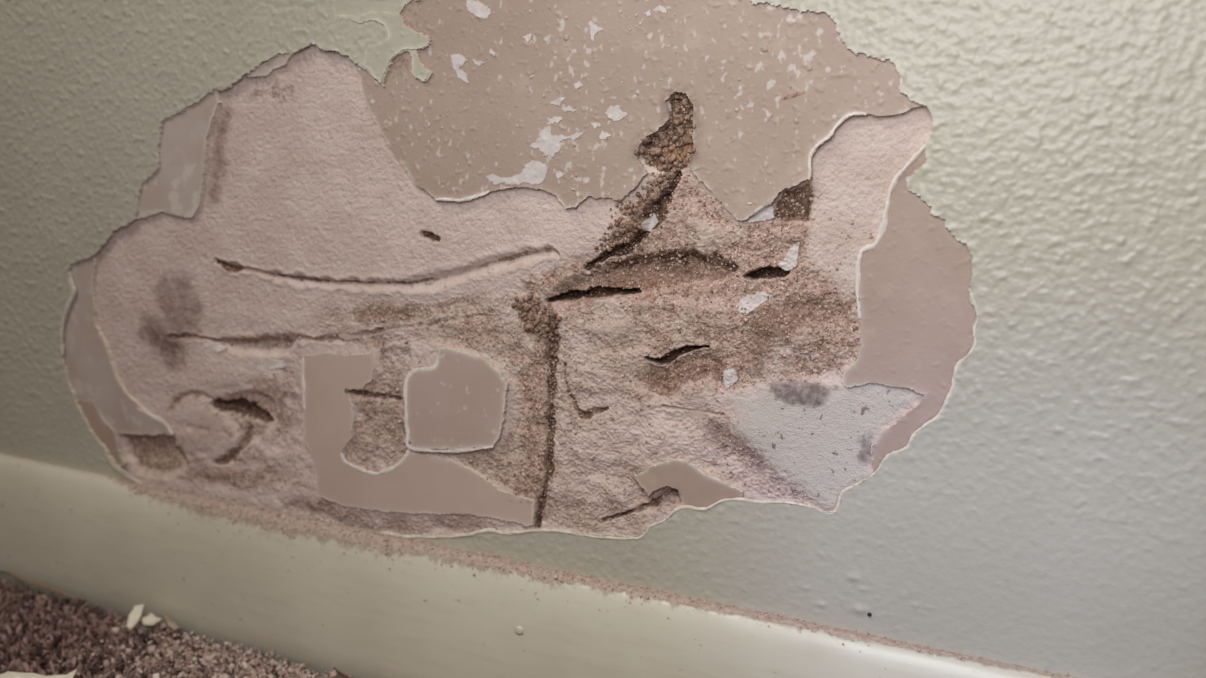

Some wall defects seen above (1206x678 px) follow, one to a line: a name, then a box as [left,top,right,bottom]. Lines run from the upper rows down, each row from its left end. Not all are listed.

peeling [467,0,532,42]
crack [585,172,682,270]
crack [217,259,244,272]
crack [274,274,434,285]
crack [481,248,551,267]
flaking render [94,10,979,540]
crack [536,317,609,527]
crack [603,488,678,521]